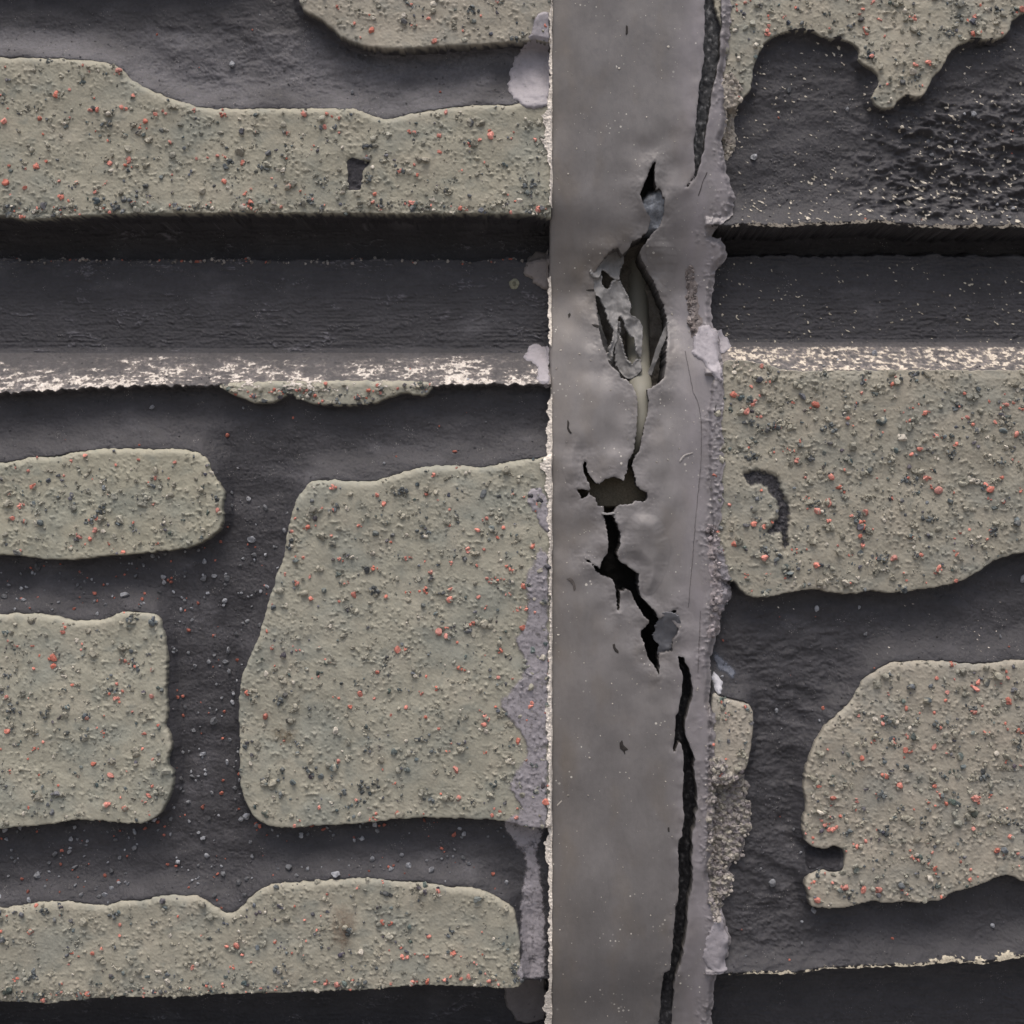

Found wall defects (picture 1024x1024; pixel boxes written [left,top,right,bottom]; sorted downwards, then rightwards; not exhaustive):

crack [687,0,722,196]
crack [577,162,716,1024]
spalling [705,754,752,923]